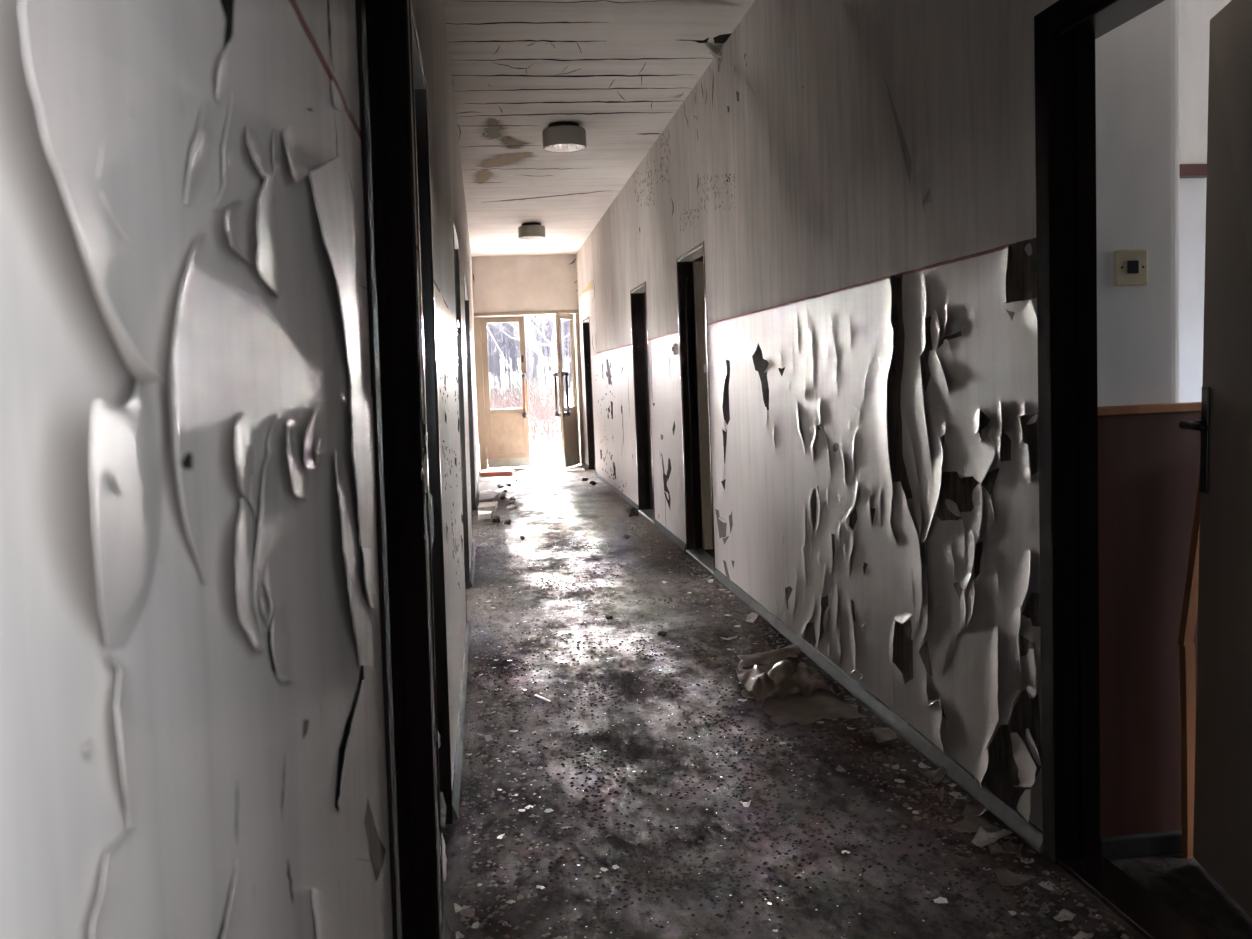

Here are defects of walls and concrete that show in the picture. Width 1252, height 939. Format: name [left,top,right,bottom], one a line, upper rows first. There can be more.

peeling [434,286,460,332]
peeling [995,238,1037,337]
peeling [20,0,377,939]
peeling [421,418,463,585]
peeling [596,359,633,492]
peeling [660,421,675,509]
peeling [707,509,735,583]
peeling [718,359,730,490]
peeling [750,273,1039,752]
peeling [974,550,1042,822]
peeling [358,798,386,881]
peeling [437,787,447,881]